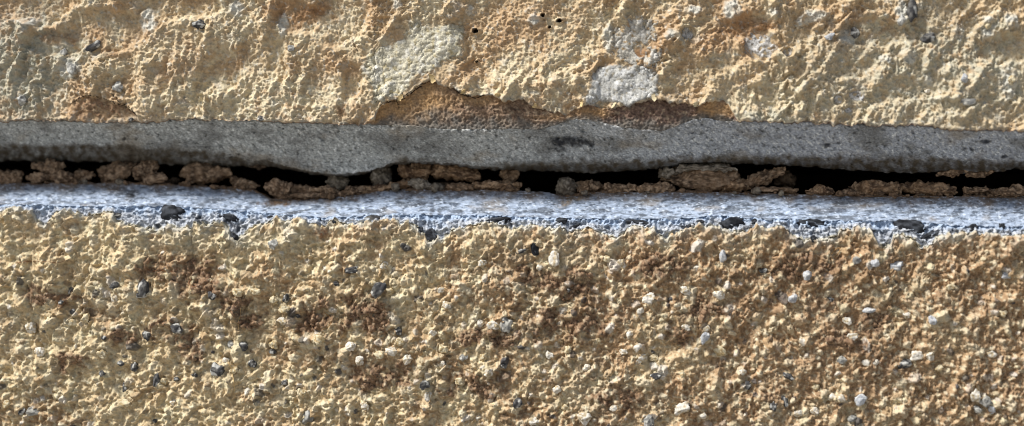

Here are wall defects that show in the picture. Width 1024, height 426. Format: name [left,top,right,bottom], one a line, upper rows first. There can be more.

spalling [361,15,737,132]